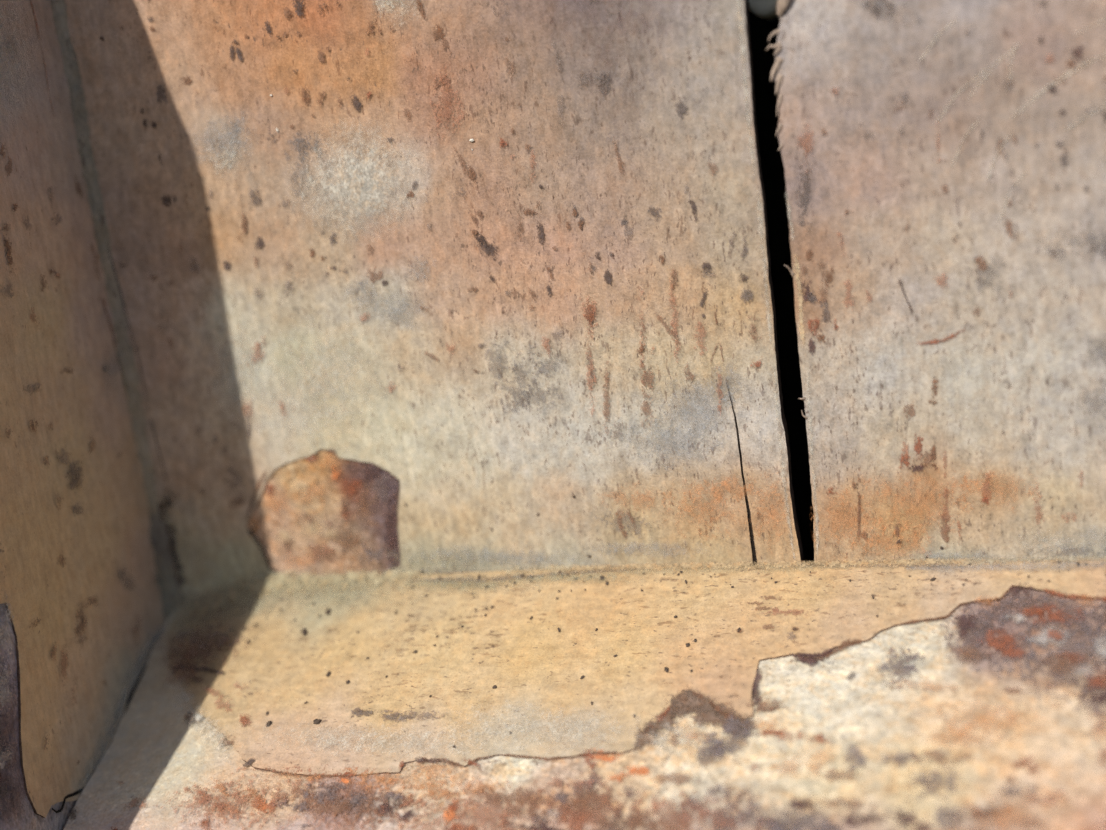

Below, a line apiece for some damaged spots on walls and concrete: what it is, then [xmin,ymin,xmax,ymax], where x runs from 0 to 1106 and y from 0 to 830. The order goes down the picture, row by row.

crack [711,313,757,565]
spalling [229,449,401,577]
rust [295,467,399,569]
rust [790,640,861,667]
rust [900,583,1106,730]
rust [243,758,416,826]
rust [444,799,483,830]
rust [399,754,566,767]
peeling [0,588,1106,830]
rust [635,668,786,768]
rust [475,746,1052,830]